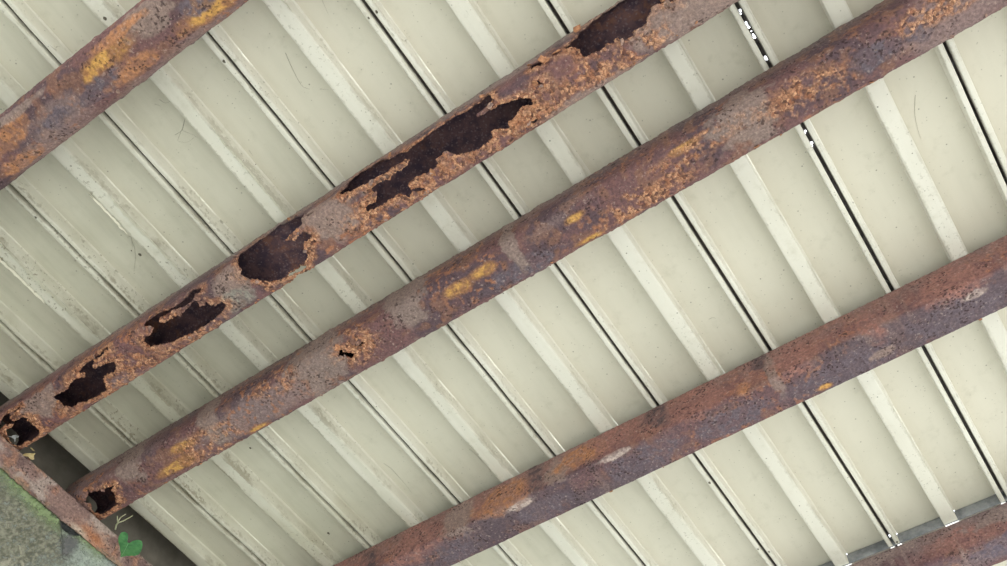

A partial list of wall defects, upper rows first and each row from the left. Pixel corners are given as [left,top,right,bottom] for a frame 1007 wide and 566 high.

corrosion [187,0,233,24]
corrosion [83,8,161,93]
corrosion [747,63,850,123]
corrosion [0,112,46,175]
corrosion [339,128,530,242]
corrosion [583,126,727,243]
corrosion [445,261,495,296]
corrosion [110,310,238,388]
corrosion [160,418,266,476]
corrosion [551,415,645,475]
corrosion [470,476,529,519]
corrosion [335,516,448,566]